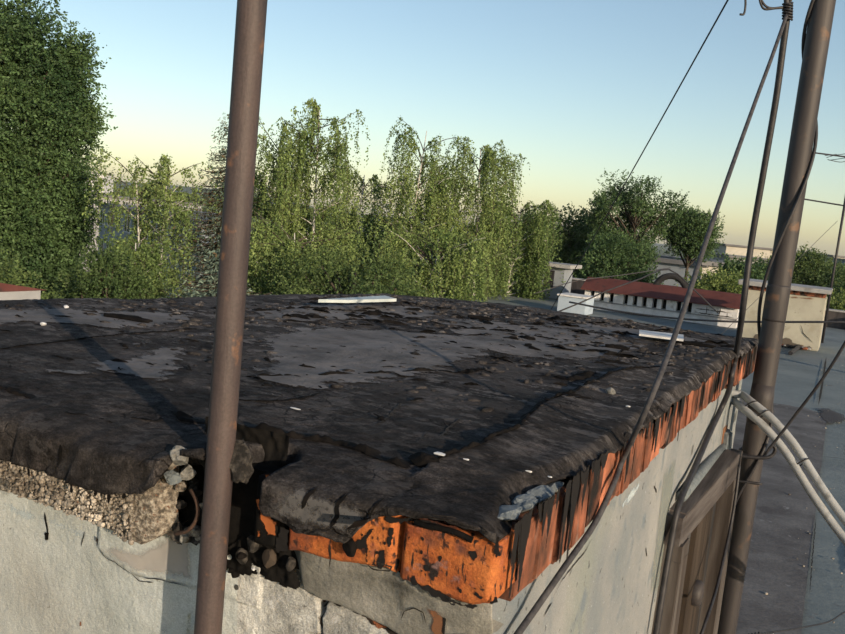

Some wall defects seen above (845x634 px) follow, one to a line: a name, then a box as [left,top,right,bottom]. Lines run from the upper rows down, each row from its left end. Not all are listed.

peeling [0,303,195,333]
peeling [46,331,199,390]
crack [252,306,423,320]
crack [239,367,486,402]
peeling [241,297,672,395]
crack [441,327,559,340]
crack [437,364,671,459]
crack [251,422,413,468]
spalling [0,460,201,588]
peeling [355,516,440,572]
peeling [410,556,498,609]
crack [320,600,397,634]